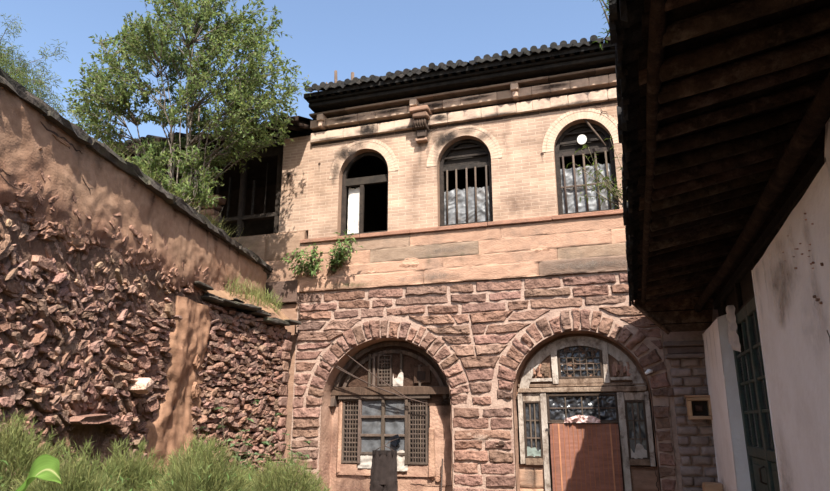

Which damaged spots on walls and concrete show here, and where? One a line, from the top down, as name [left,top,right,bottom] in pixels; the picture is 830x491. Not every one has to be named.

crack [40,121,82,154]